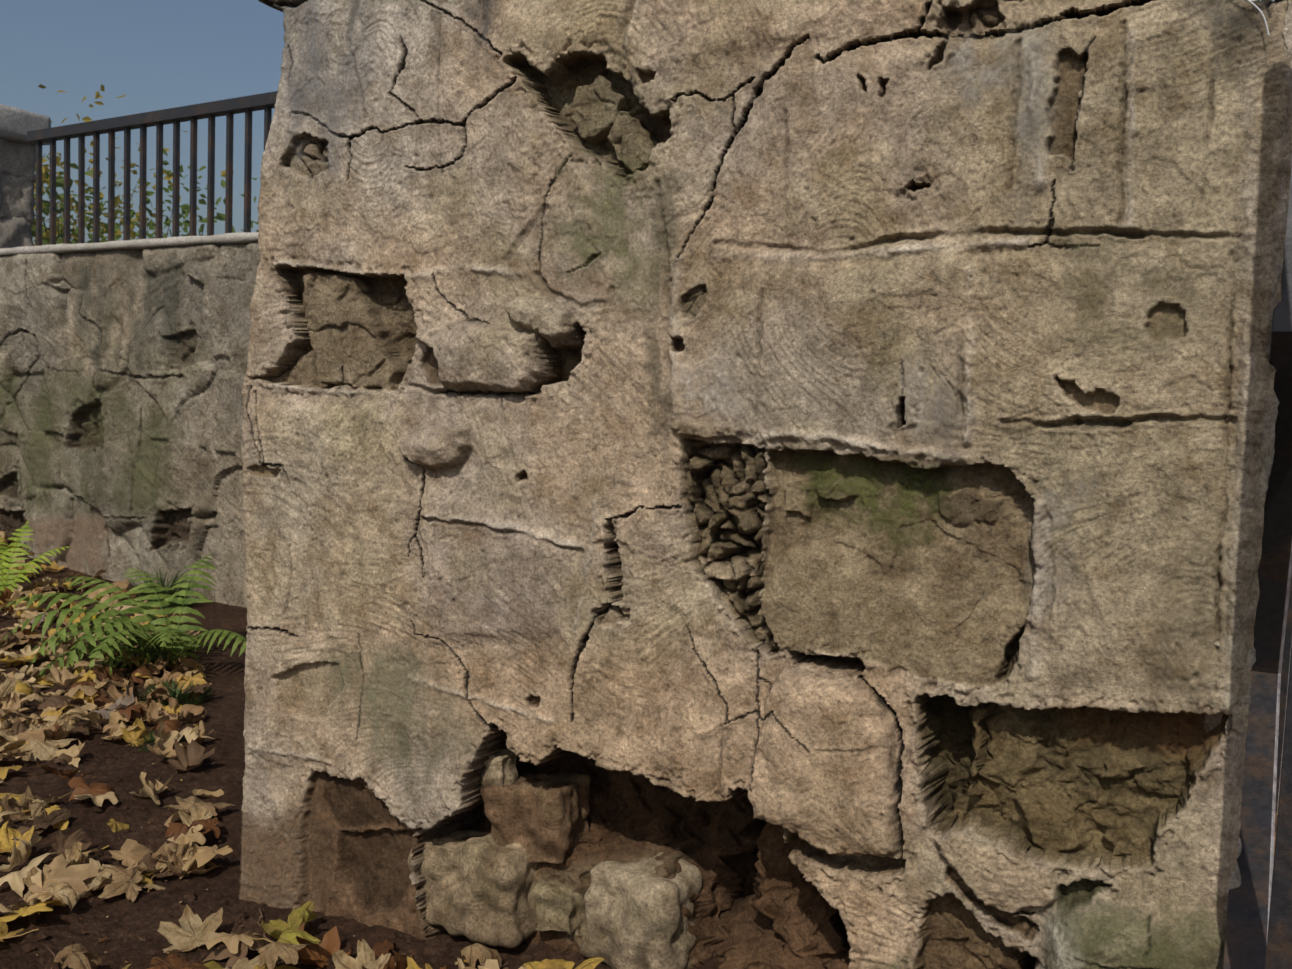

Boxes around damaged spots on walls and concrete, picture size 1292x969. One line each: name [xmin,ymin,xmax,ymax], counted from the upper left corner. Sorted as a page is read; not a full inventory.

crack [291,0,517,174]
spalling [507,50,671,175]
crack [671,0,1157,258]
spalling [1047,47,1089,158]
spalling [259,264,442,390]
crack [606,503,686,520]
crack [570,598,623,721]
crack [686,623,810,790]
crack [860,675,905,849]
spalling [680,437,1233,914]
spalling [304,731,907,969]
spalling [918,867,1040,969]